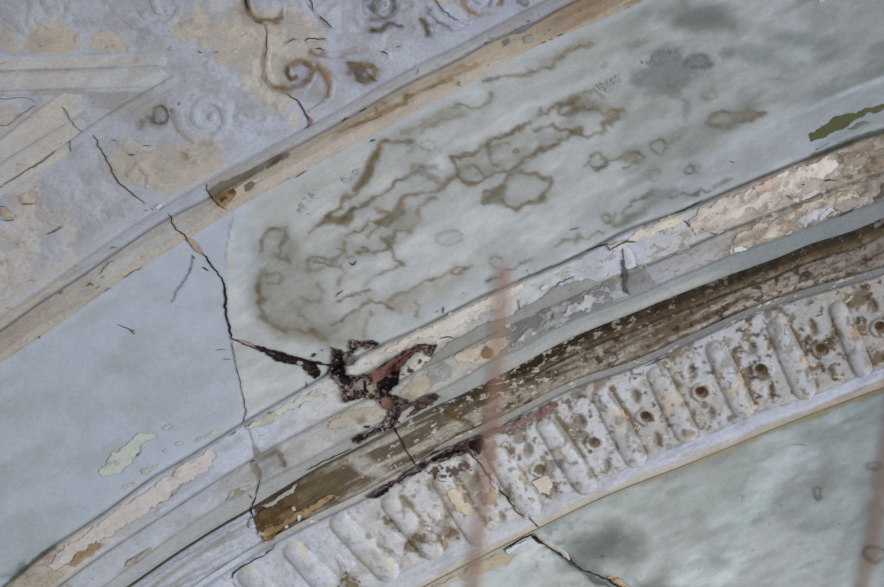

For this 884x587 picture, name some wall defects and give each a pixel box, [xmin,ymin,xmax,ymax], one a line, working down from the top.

crack [286,93,313,129]
leakage [540,73,621,139]
leakage [322,124,436,224]
leakage [438,123,553,211]
crack [63,107,332,455]
leakage [350,211,411,271]
peeling [503,273,601,349]
spalling [311,292,496,444]
peeling [99,424,173,477]
peeling [48,449,216,571]
crack [232,480,275,586]
crack [469,453,628,587]